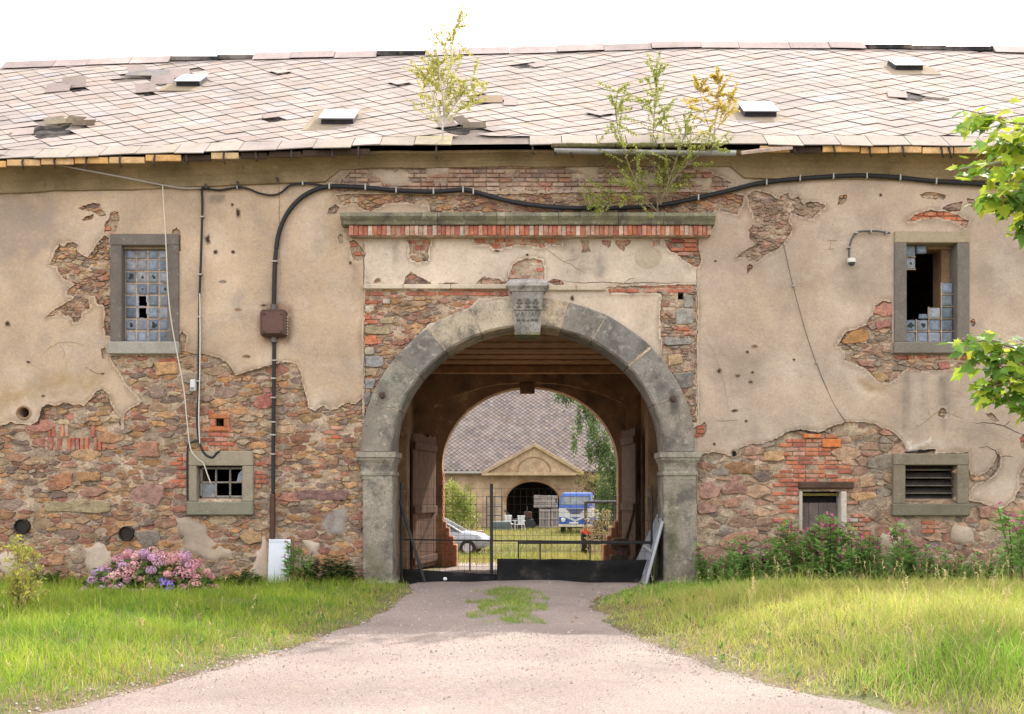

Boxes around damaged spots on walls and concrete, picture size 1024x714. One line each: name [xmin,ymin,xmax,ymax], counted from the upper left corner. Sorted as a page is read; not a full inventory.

flaking render [328,167,847,273]
flaking render [907,192,977,228]
flaking render [0,204,564,583]
flaking render [607,284,1024,582]
crack [922,409,1024,481]